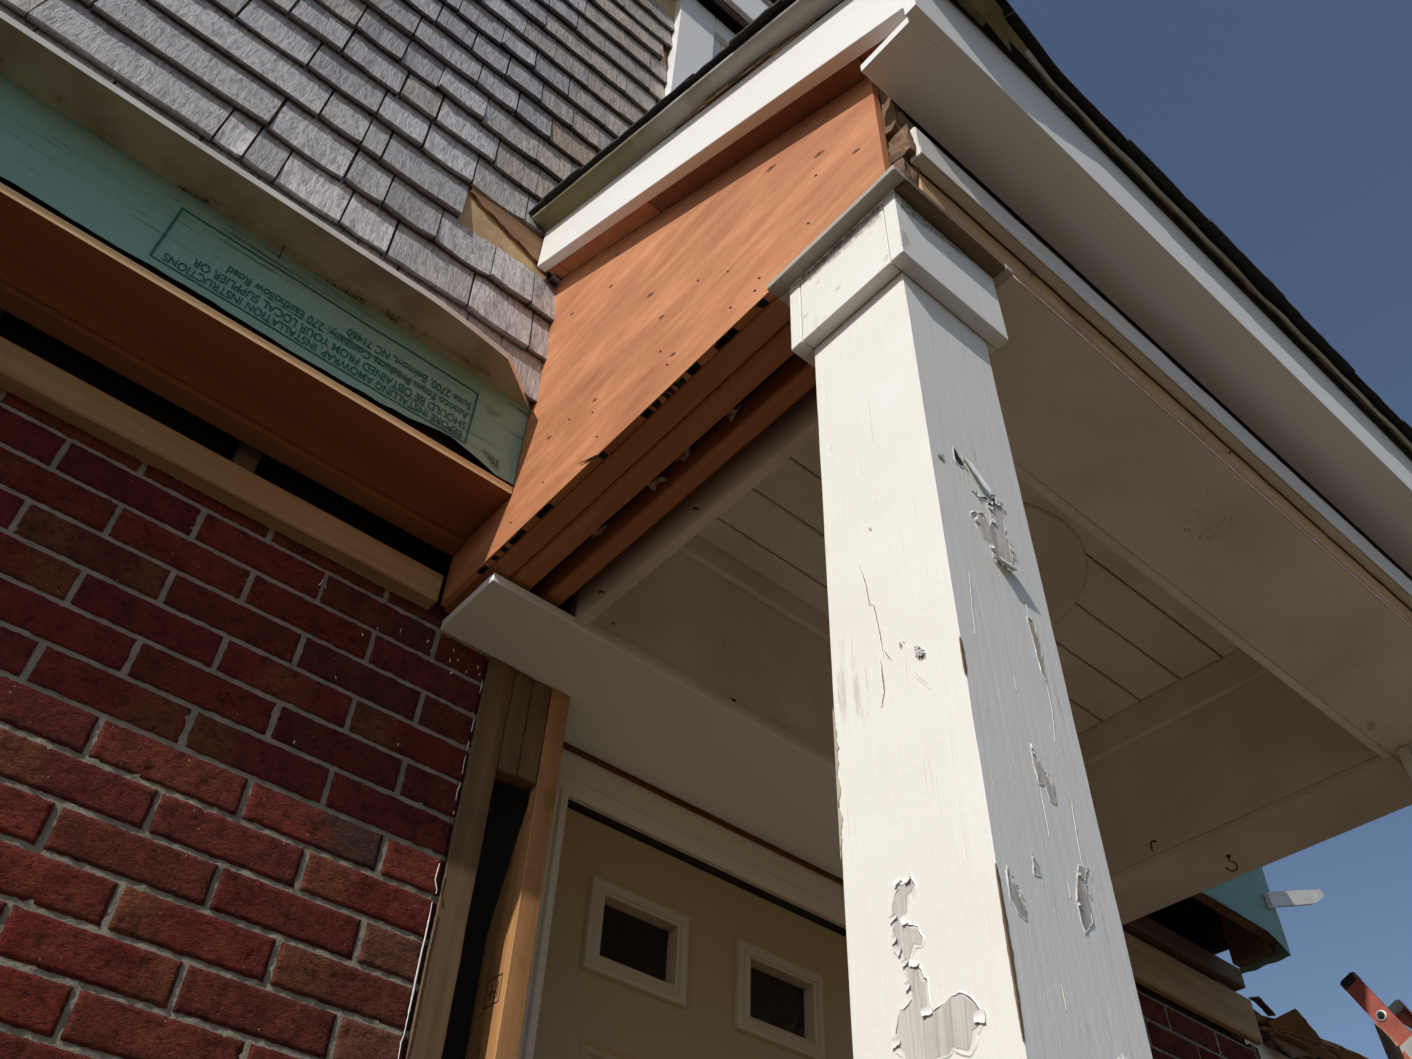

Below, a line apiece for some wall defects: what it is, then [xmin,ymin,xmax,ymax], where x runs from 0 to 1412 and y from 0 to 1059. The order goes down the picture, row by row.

peeling [938,447,1022,573]
peeling [889,873,985,1059]
peeling [995,863,1027,1042]
peeling [1031,853,1042,878]